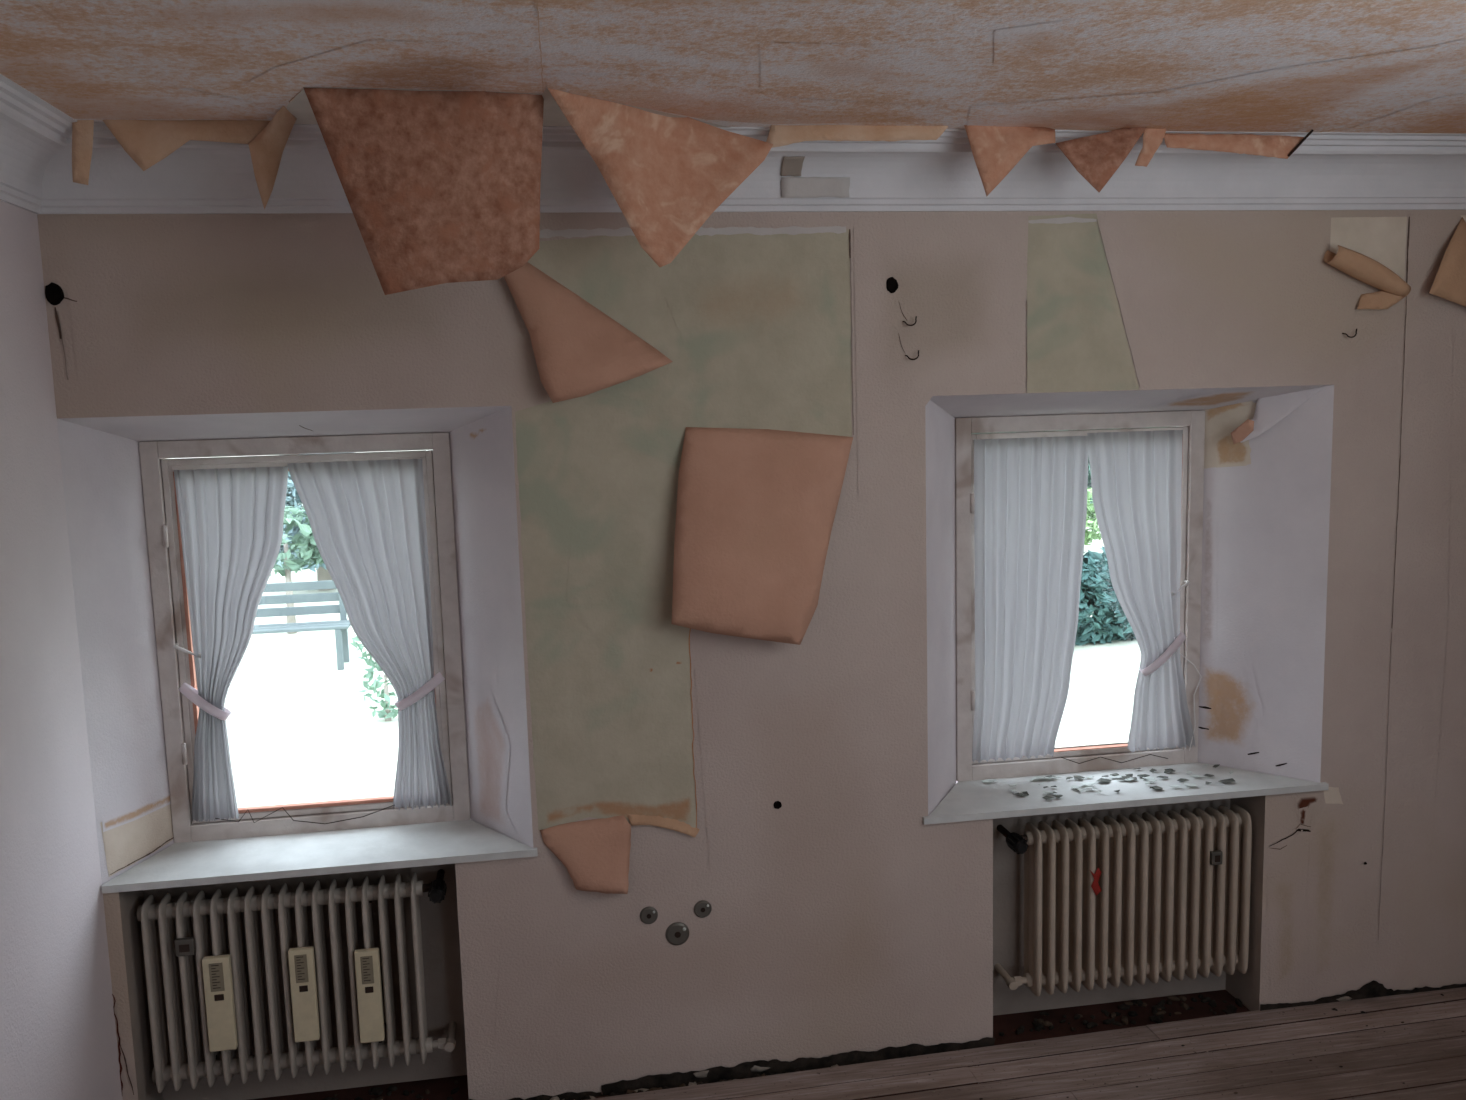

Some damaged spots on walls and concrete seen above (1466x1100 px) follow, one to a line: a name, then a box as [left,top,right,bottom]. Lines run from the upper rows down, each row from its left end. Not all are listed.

flaking render [287,87,458,124]
flaking render [1330,217,1410,283]
flaking render [515,226,854,830]